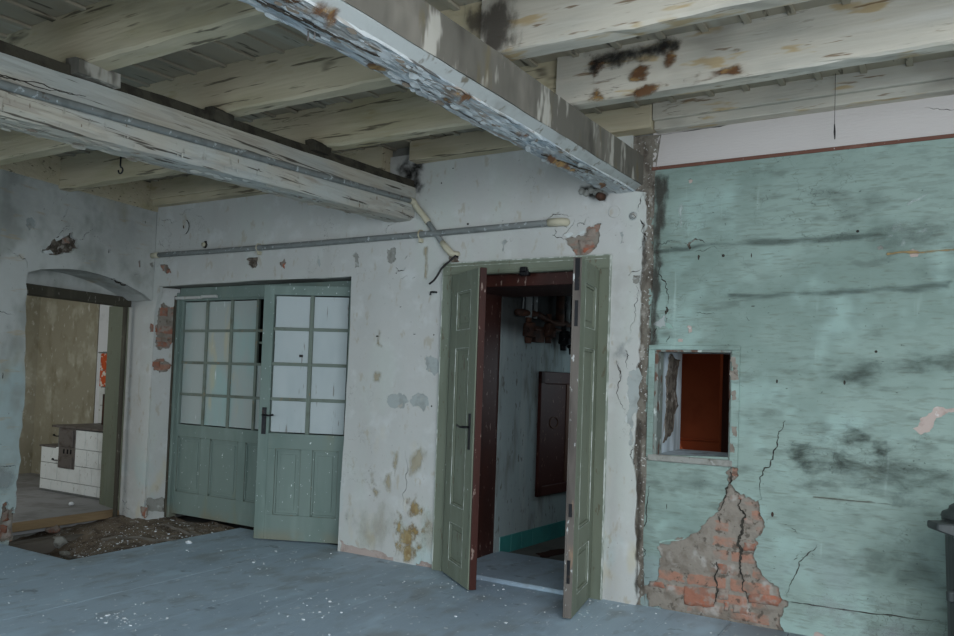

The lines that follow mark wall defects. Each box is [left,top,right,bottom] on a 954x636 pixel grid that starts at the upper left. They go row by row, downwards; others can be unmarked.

leakage [629,61,659,97]
leakage [664,49,677,68]
leakage [716,65,741,75]
flaking render [42,233,77,255]
flaking render [563,223,601,256]
crack [632,198,673,340]
flaking render [150,303,174,373]
peeling [913,406,954,435]
crack [759,421,785,495]
spalling [0,497,236,560]
flaking render [644,467,789,631]
crack [786,528,944,623]